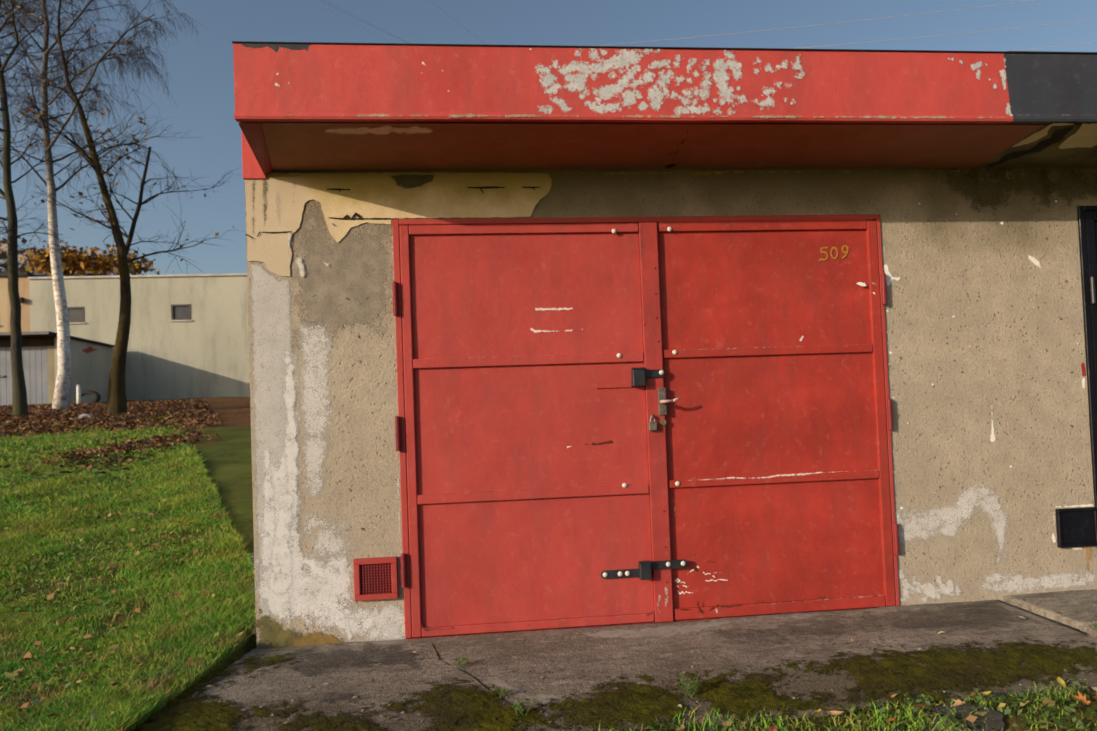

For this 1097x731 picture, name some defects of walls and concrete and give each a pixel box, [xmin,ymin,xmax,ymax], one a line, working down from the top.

peeling [449,48,954,119]
peeling [948,57,1006,90]
damp [918,114,1097,224]
damp [251,317,435,677]
damp [580,484,1097,646]
crack [411,643,526,707]